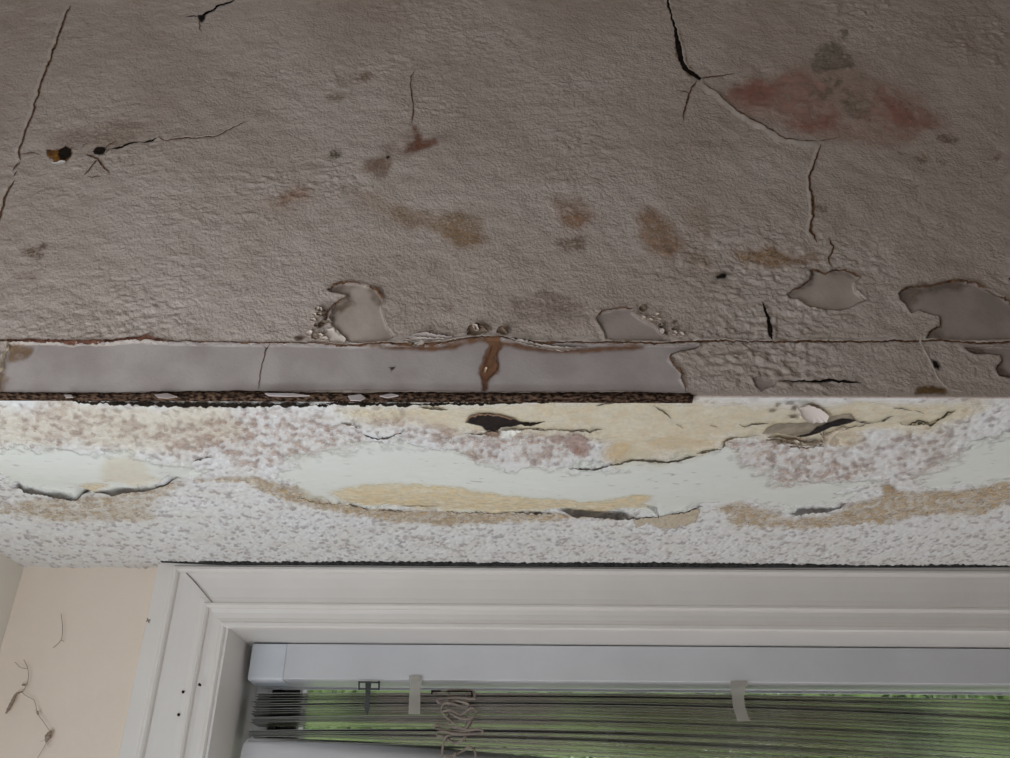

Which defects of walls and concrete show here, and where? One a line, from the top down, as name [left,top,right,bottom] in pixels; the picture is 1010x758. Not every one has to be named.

crack [186,0,234,31]
crack [0,4,71,218]
crack [111,118,250,154]
rust [408,127,435,151]
crack [667,0,836,267]
peeling [787,269,864,311]
peeling [0,281,700,393]
crack [0,301,1010,389]
rust [389,337,639,391]
peeling [898,279,1010,378]
peeling [798,405,829,424]
peeling [633,509,699,529]